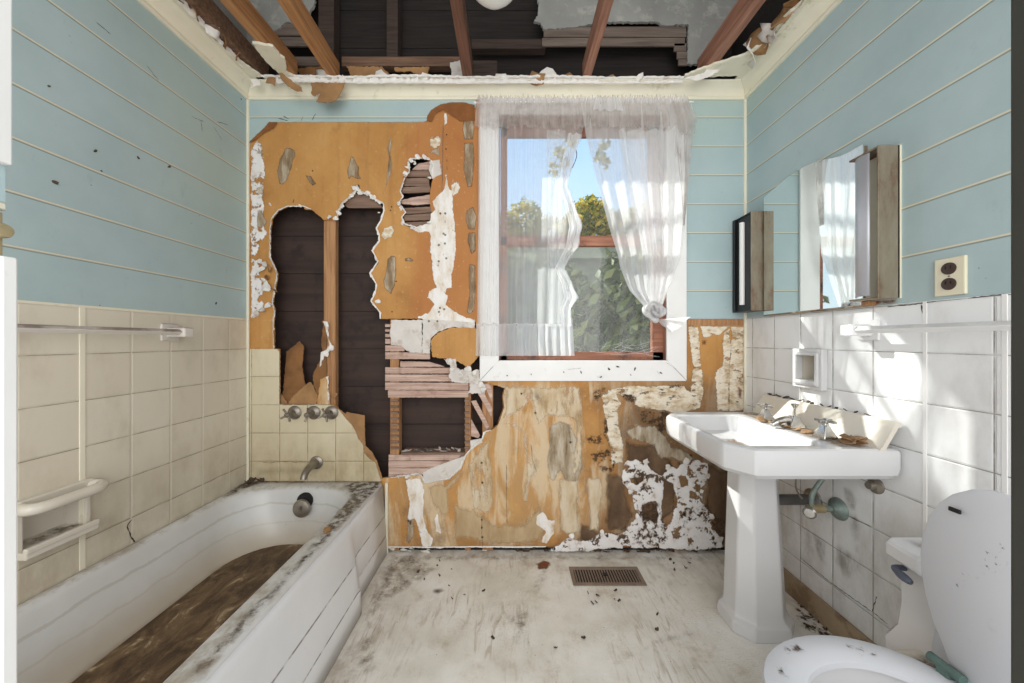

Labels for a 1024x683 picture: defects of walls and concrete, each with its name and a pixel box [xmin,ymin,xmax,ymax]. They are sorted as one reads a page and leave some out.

peeling [250,73,345,103]
peeling [684,60,721,81]
peeling [250,142,310,349]
spalling [327,149,486,394]
spalling [390,388,505,484]
flaking render [551,457,724,552]